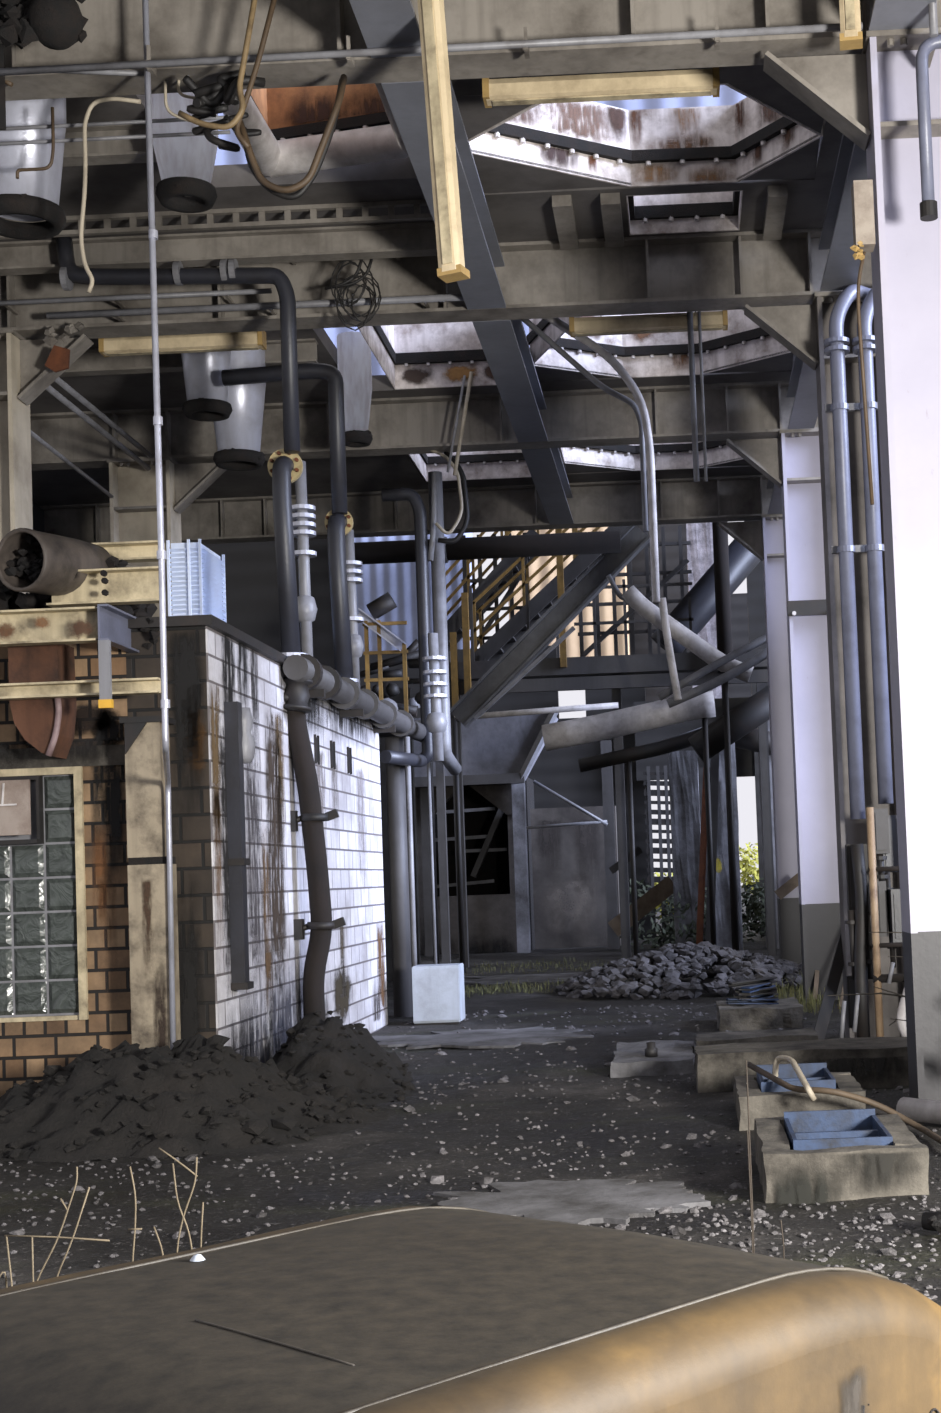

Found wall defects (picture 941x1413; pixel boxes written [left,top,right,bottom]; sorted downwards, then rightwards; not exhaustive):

rust [291,95,385,124]
rust [510,102,641,168]
rust [644,108,712,181]
rust [735,101,743,131]
rust [0,623,15,639]
rust [70,619,93,639]
damp [171,634,204,790]
damp [306,698,367,740]
damp [316,754,337,827]
damp [220,730,231,964]
damp [222,635,304,1063]
damp [179,918,200,1040]